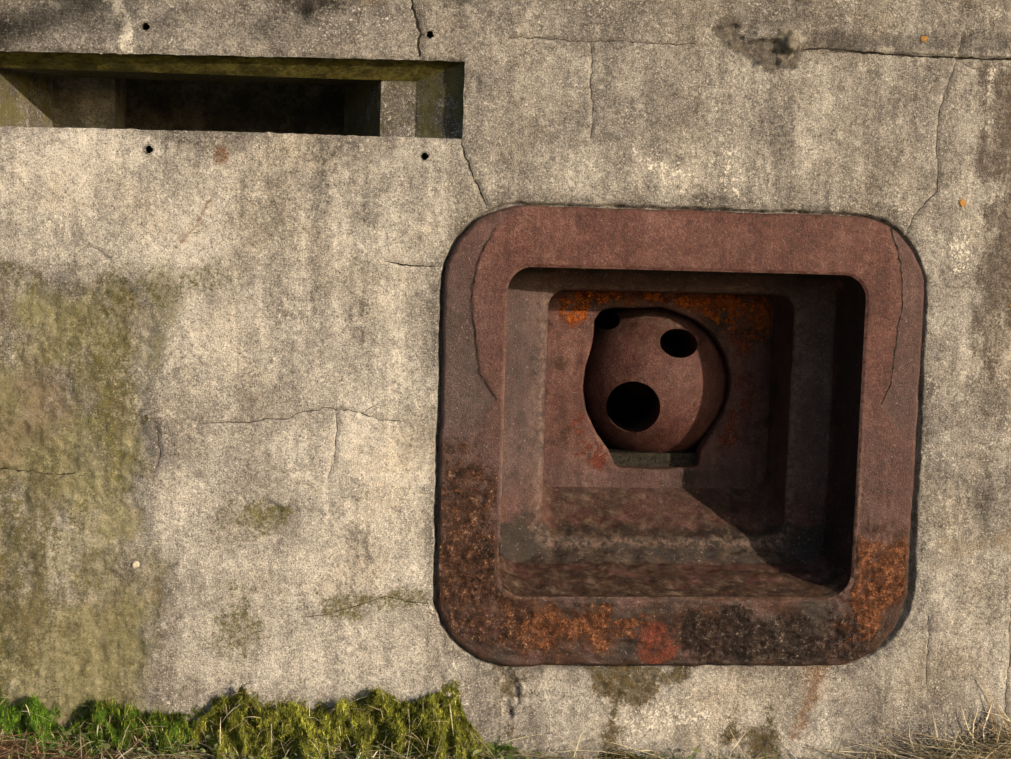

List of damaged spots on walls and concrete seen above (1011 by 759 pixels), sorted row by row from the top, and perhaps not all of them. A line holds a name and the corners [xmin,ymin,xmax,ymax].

efflorescence [103,0,136,54]
damp [274,0,346,20]
crack [513,36,696,139]
crack [801,35,1011,405]
damp [812,30,1011,384]
rust [560,291,772,345]
crack [0,468,82,476]
damp [68,334,148,505]
crack [197,406,402,474]
damp [0,461,61,706]
rust [439,438,908,759]